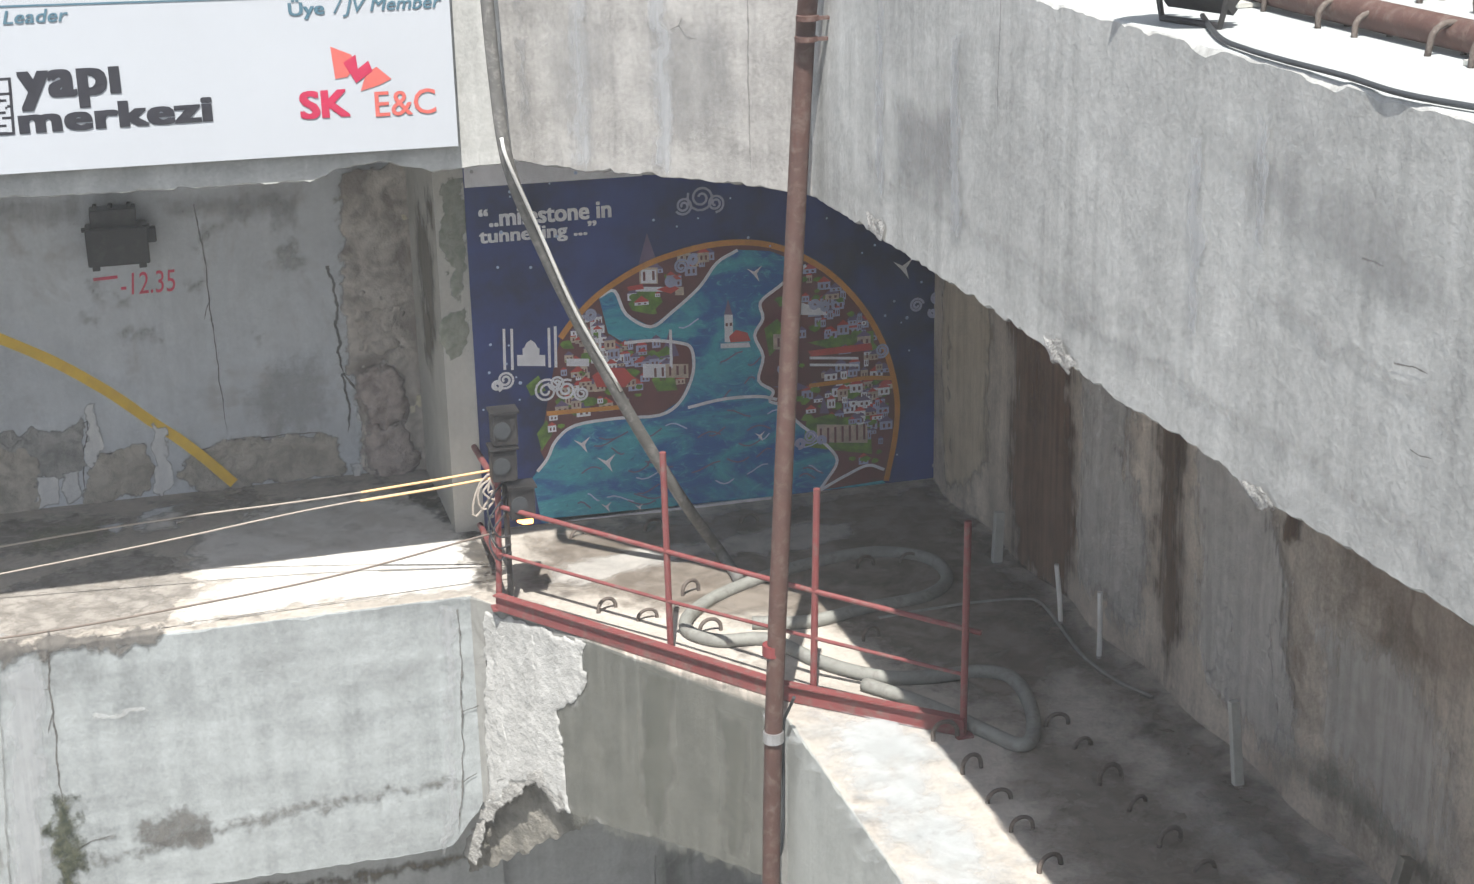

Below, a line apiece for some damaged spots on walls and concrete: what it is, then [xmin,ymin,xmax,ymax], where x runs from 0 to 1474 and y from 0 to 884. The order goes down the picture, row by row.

spalling [335,163,426,475]
crack [41,630,63,798]
spalling [0,419,155,514]
crack [83,421,112,487]
water stain [0,404,496,884]
peeling [464,611,587,872]
water stain [531,507,773,614]
water stain [556,642,765,875]
water stain [787,281,1347,884]
water stain [1315,626,1451,850]